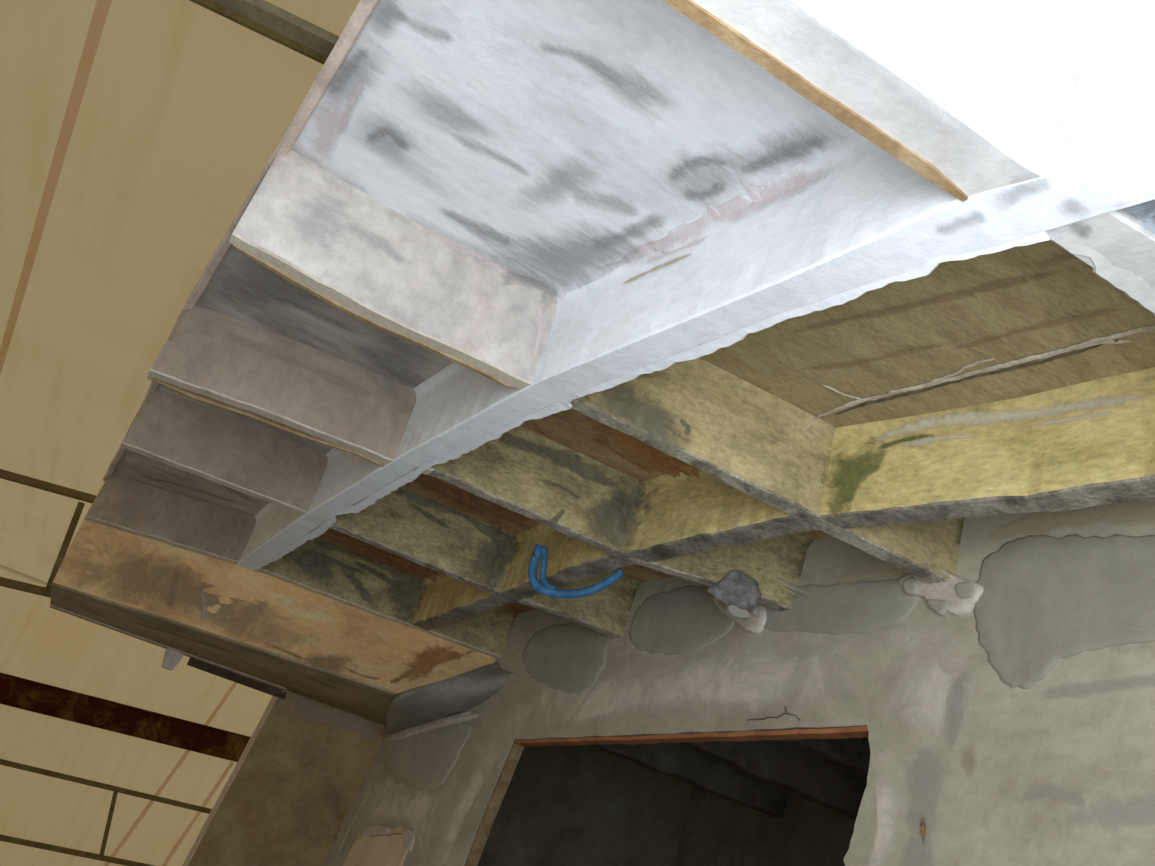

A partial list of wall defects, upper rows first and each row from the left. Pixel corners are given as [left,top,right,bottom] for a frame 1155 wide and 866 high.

damp [751,138,822,168]
damp [446,212,658,294]
crack [807,325,1155,428]
damp [86,557,266,633]
damp [295,541,423,620]
damp [399,488,518,588]
damp [500,432,649,550]
damp [829,395,1139,515]